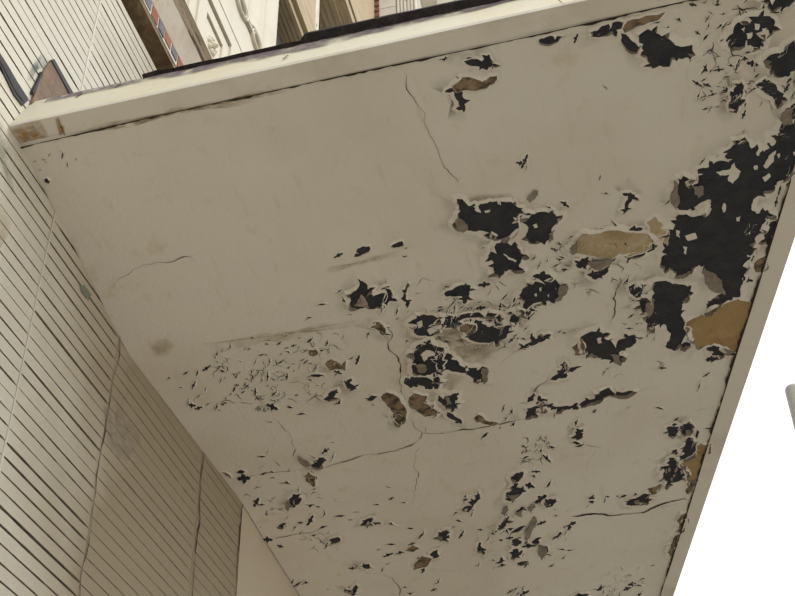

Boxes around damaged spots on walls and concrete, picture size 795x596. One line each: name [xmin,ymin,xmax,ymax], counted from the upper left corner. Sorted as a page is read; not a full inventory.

crack [20,0,698,181]
peeling [166,0,795,447]
crack [387,329,405,397]
crack [572,164,795,595]
crack [80,349,120,591]
crack [192,459,204,596]
peeling [220,441,484,574]
peeling [342,583,364,596]
crack [330,419,520,496]
peeling [474,435,578,569]
peeling [571,564,656,596]
flaking render [586,415,713,508]